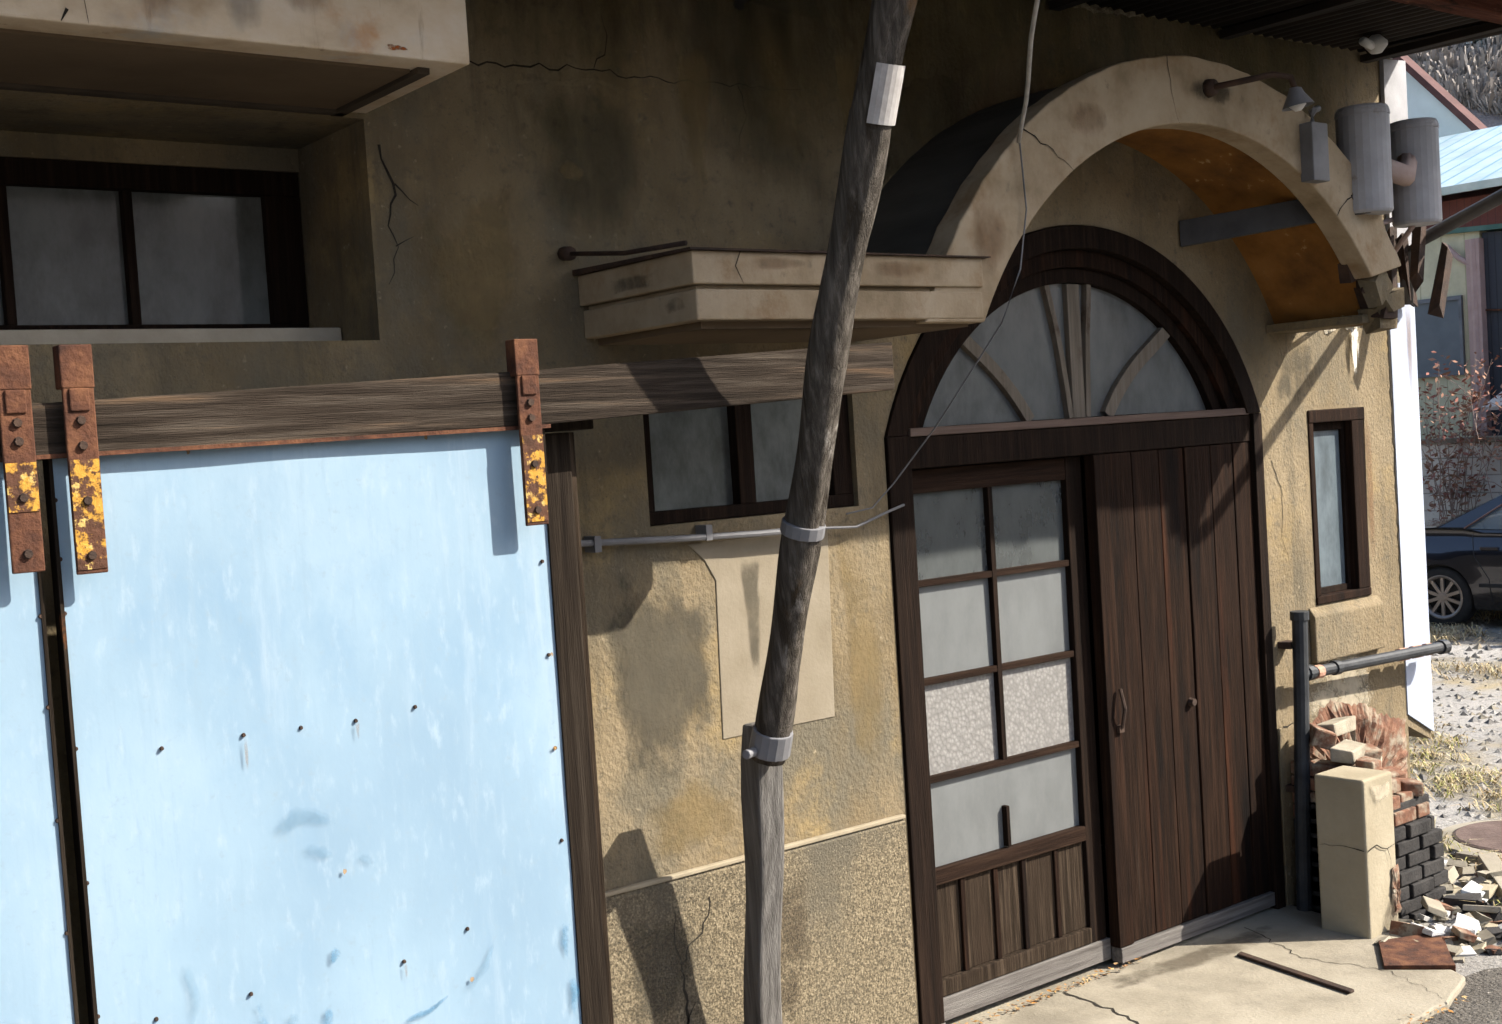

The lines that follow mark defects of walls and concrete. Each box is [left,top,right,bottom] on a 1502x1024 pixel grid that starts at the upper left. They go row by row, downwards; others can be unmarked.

crack [377,144,417,284]
leakage [611,602,707,759]
spalling [1310,697,1408,778]
spalling [1392,864,1402,916]
crack [674,896,711,1024]
crack [1063,992,1139,1024]